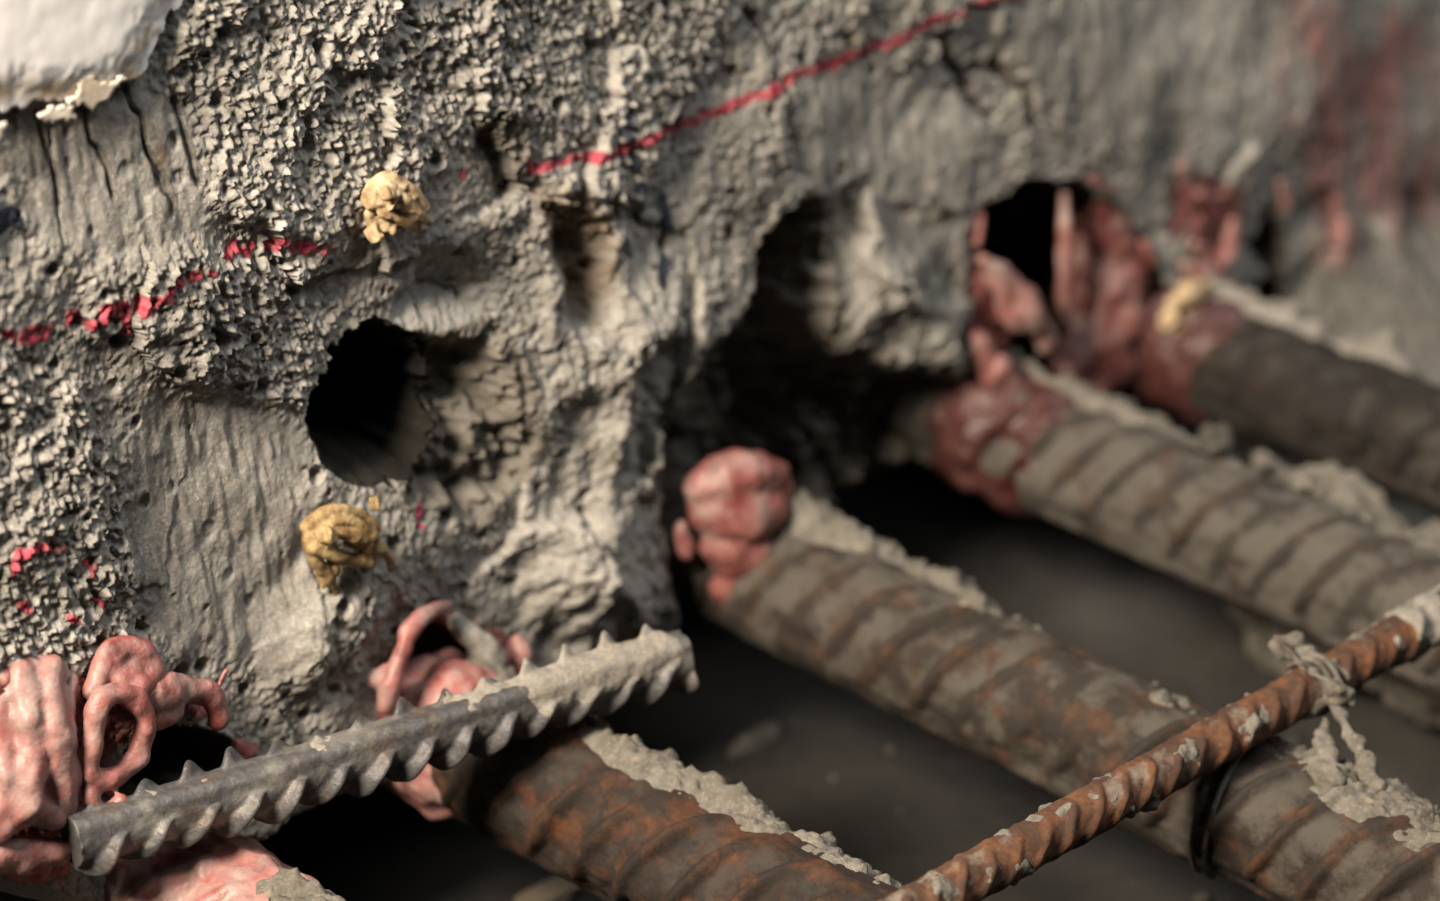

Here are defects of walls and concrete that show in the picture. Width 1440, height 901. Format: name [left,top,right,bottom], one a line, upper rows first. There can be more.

peeling [37,74,128,124]
crack [741,0,777,62]
crack [927,29,1038,133]
spalling [81,0,739,409]
spalling [1237,172,1440,385]
peeling [231,738,259,759]